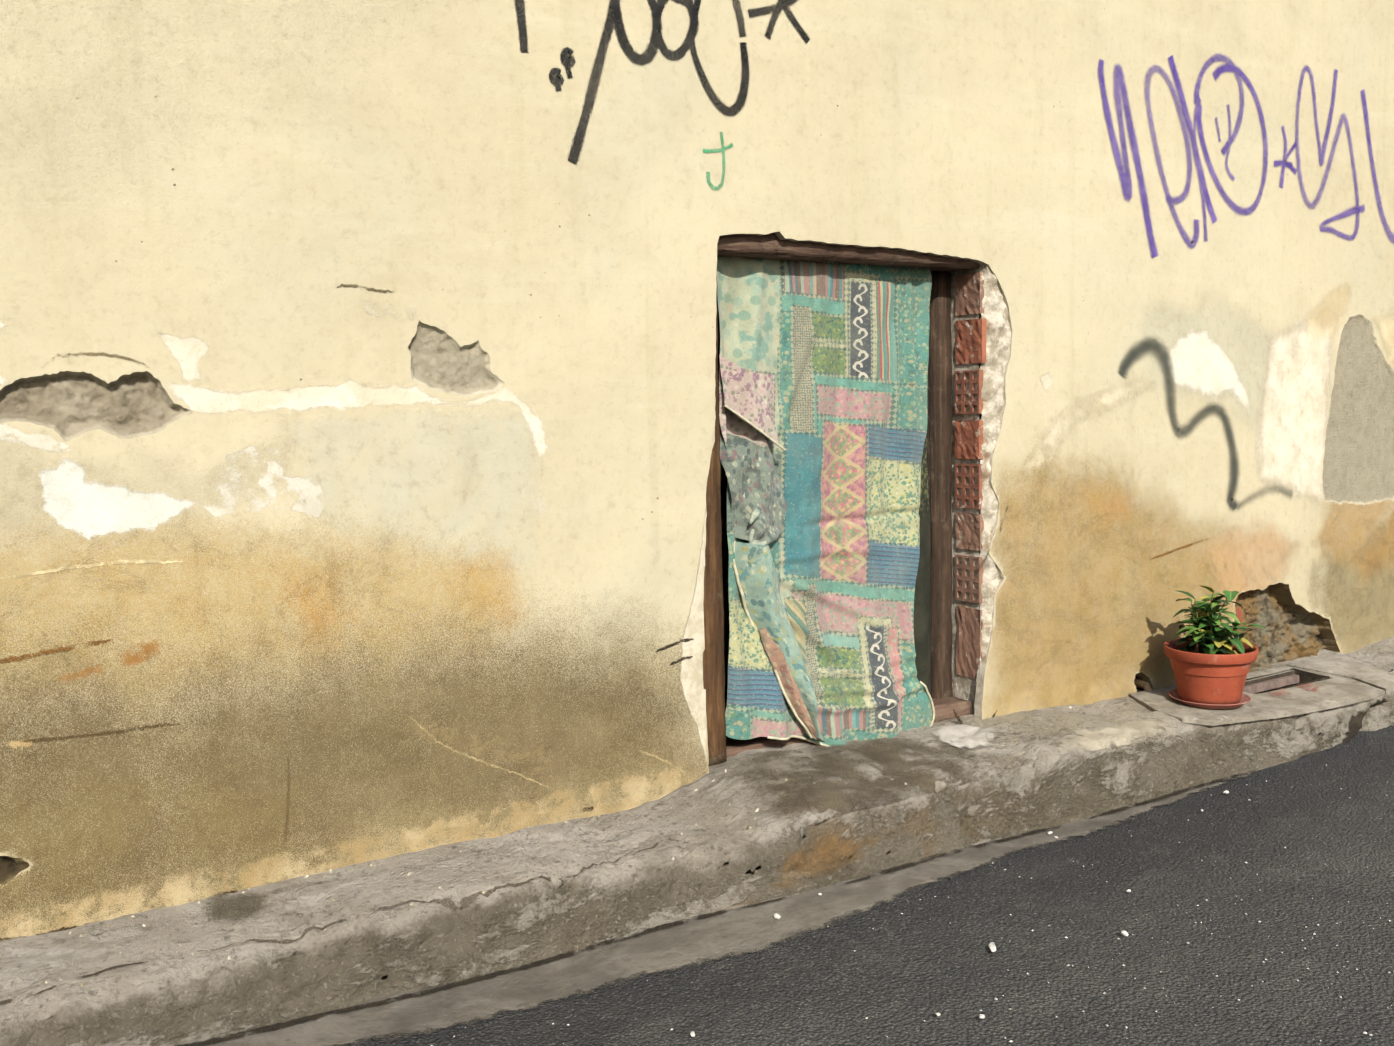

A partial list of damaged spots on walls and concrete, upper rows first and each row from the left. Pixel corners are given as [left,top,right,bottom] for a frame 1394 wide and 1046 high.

peeling [2,737,34,749]
flaking render [0,321,549,540]
leakage [0,498,709,938]
flaking render [950,265,1153,719]
leakage [983,436,1394,716]
peeling [1160,326,1250,411]
flaking render [1234,582,1340,672]
flaking render [1322,314,1394,505]
flaking render [0,761,693,941]